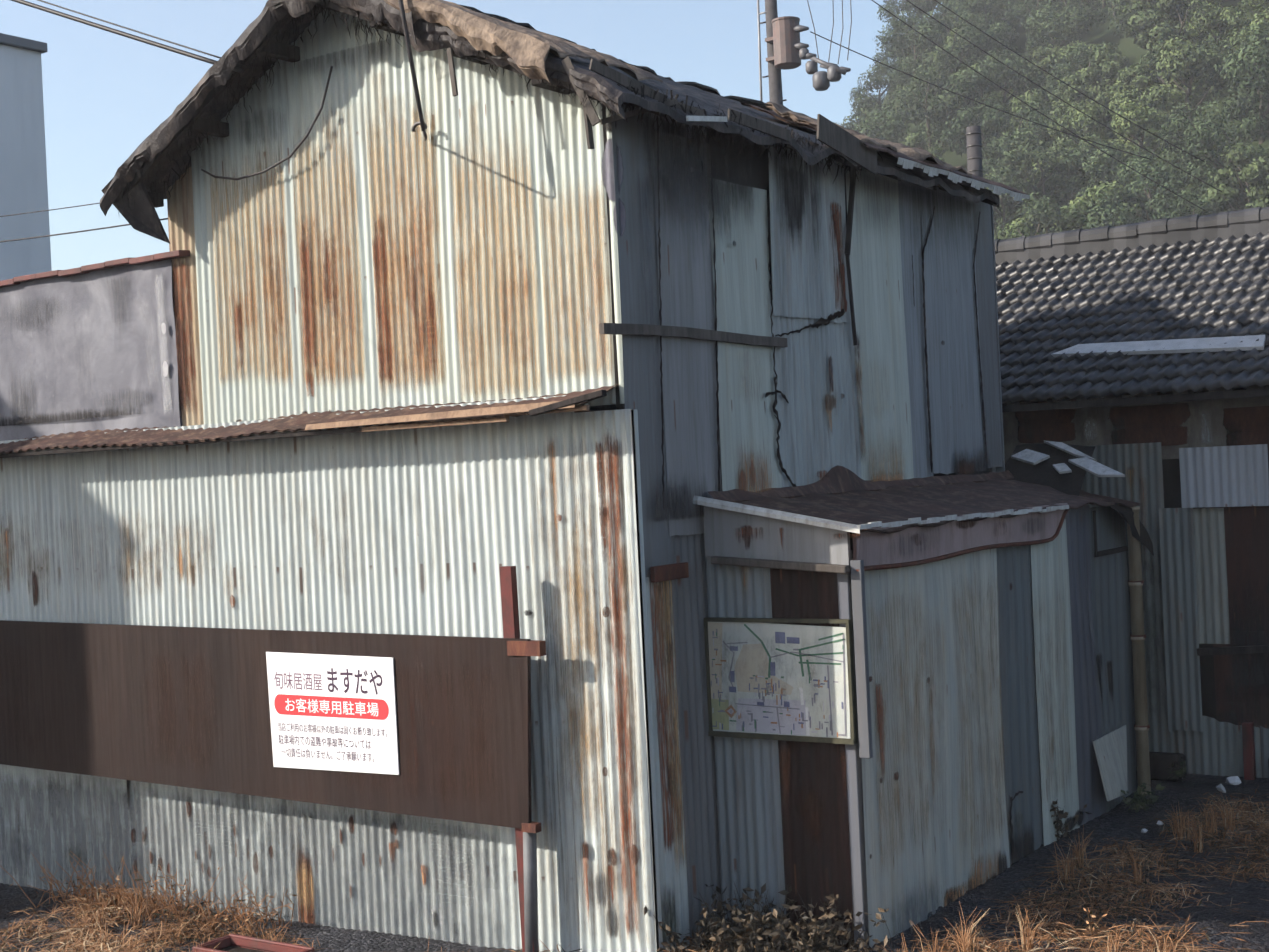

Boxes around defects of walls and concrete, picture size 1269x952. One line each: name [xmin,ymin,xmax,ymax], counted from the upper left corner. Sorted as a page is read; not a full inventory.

leakage [0,388,137,426]
corrosion [167,166,204,426]
corrosion [211,117,613,395]
corrosion [531,446,562,539]
crack [765,193,845,487]
corrosion [829,203,847,312]
corrosion [576,434,639,934]
corrosion [869,658,930,836]